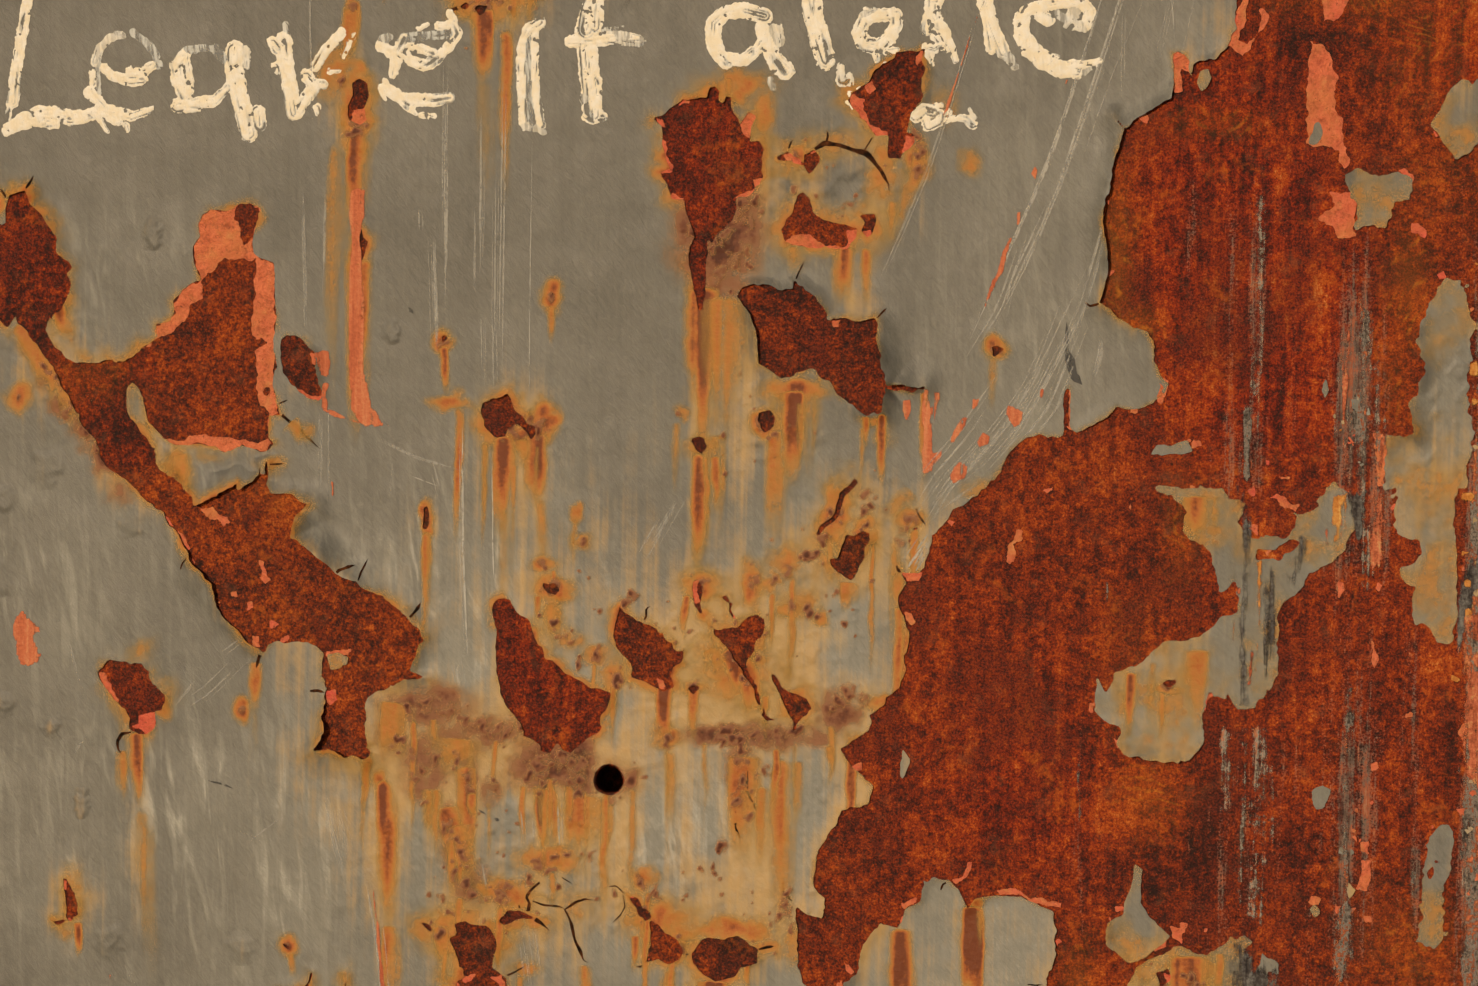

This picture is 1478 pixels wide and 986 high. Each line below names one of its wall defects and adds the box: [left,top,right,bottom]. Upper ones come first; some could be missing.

peeling [0,176,440,783]
rust [320,0,375,401]
rust [451,0,537,162]
rust [430,331,624,731]
peeling [489,593,706,753]
rust [361,483,924,986]
rust [674,192,766,554]
peeling [649,87,820,310]
peeling [729,272,943,432]
peeling [794,0,1478,986]
peeling [626,889,758,986]
rust [960,898,985,986]